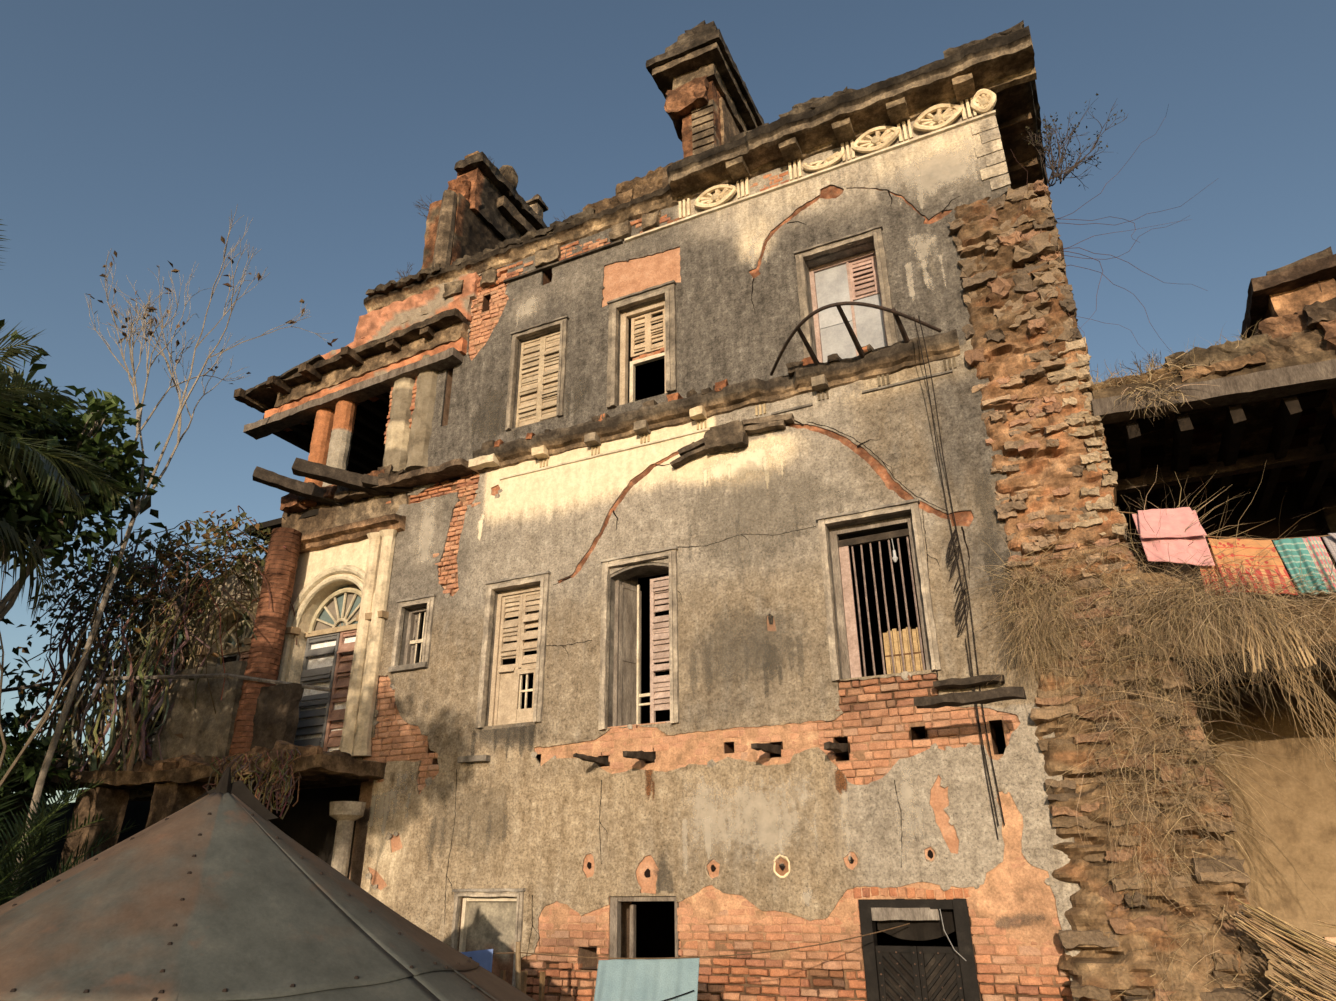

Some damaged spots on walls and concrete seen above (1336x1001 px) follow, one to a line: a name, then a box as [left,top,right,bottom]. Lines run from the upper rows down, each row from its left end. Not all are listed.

flaking render [466,261,534,360]
flaking render [559,238,611,261]
flaking render [600,247,681,307]
crack [749,186,960,310]
flaking render [408,472,503,598]
crack [554,452,679,585]
crack [786,420,974,589]
flaking render [363,676,439,795]
flaking render [531,671,1020,785]
flaking render [677,775,1073,1001]
flaking render [521,896,610,1001]